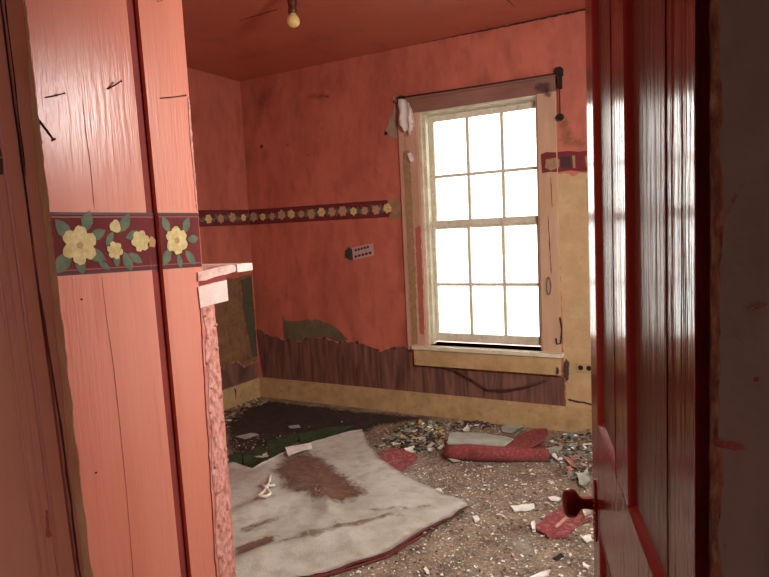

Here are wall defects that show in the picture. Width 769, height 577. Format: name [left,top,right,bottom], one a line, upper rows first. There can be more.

peeling [202,150,592,577]